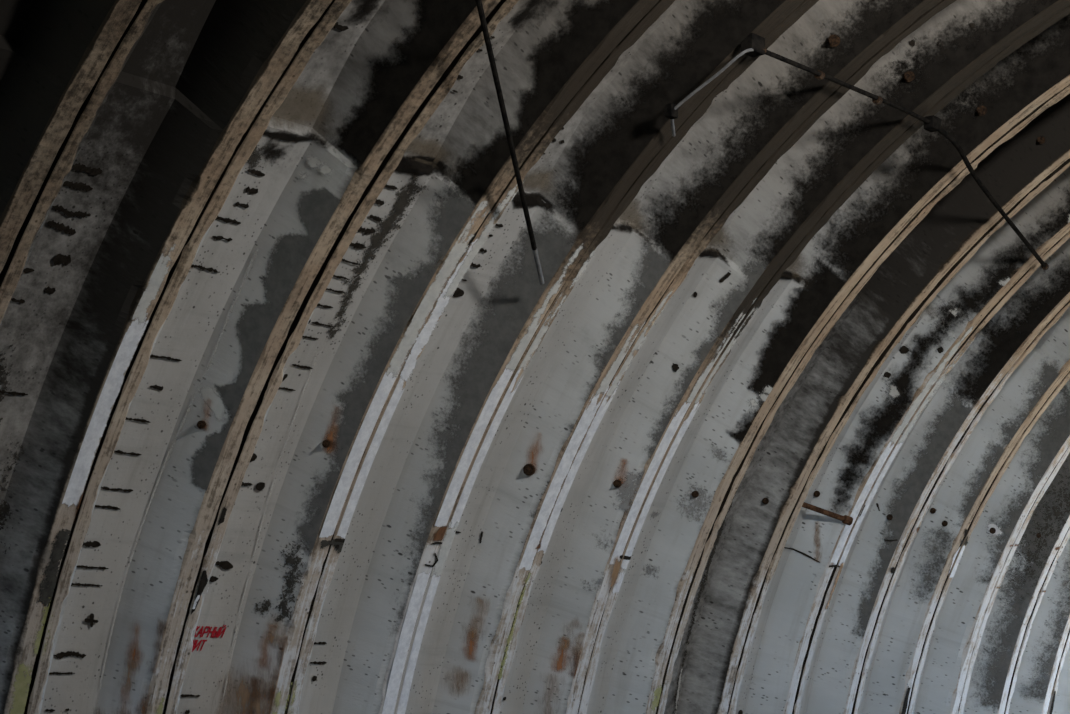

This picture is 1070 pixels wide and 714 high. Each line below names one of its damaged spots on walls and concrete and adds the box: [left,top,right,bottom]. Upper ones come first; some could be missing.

damp [729,257,846,443]
spalling [191,561,233,614]
rust [251,537,307,666]